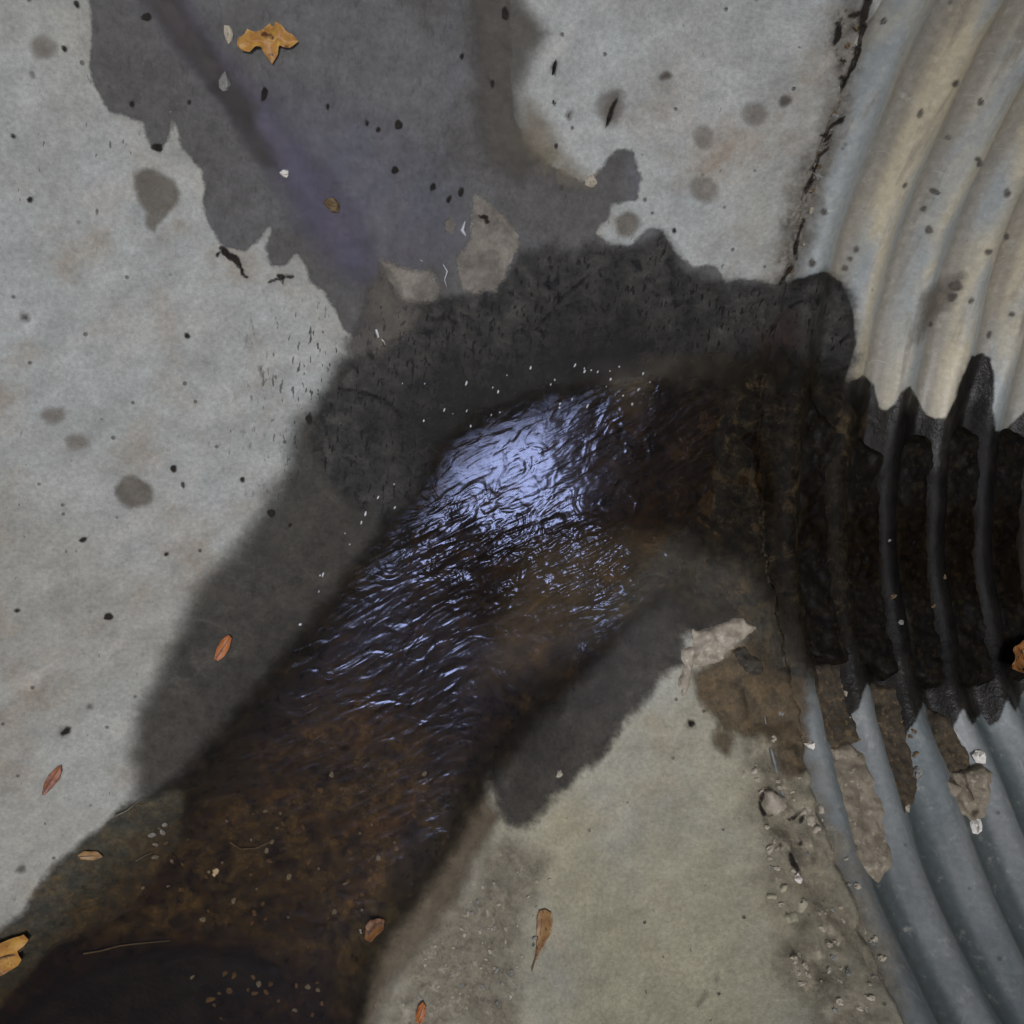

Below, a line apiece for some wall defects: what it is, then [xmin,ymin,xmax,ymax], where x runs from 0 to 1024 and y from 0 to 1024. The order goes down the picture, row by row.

crack [834,0,873,90]
crack [779,116,846,285]
water stain [89,0,1024,800]
water stain [360,574,733,1024]
spalling [678,617,756,696]
spalling [741,739,893,1024]